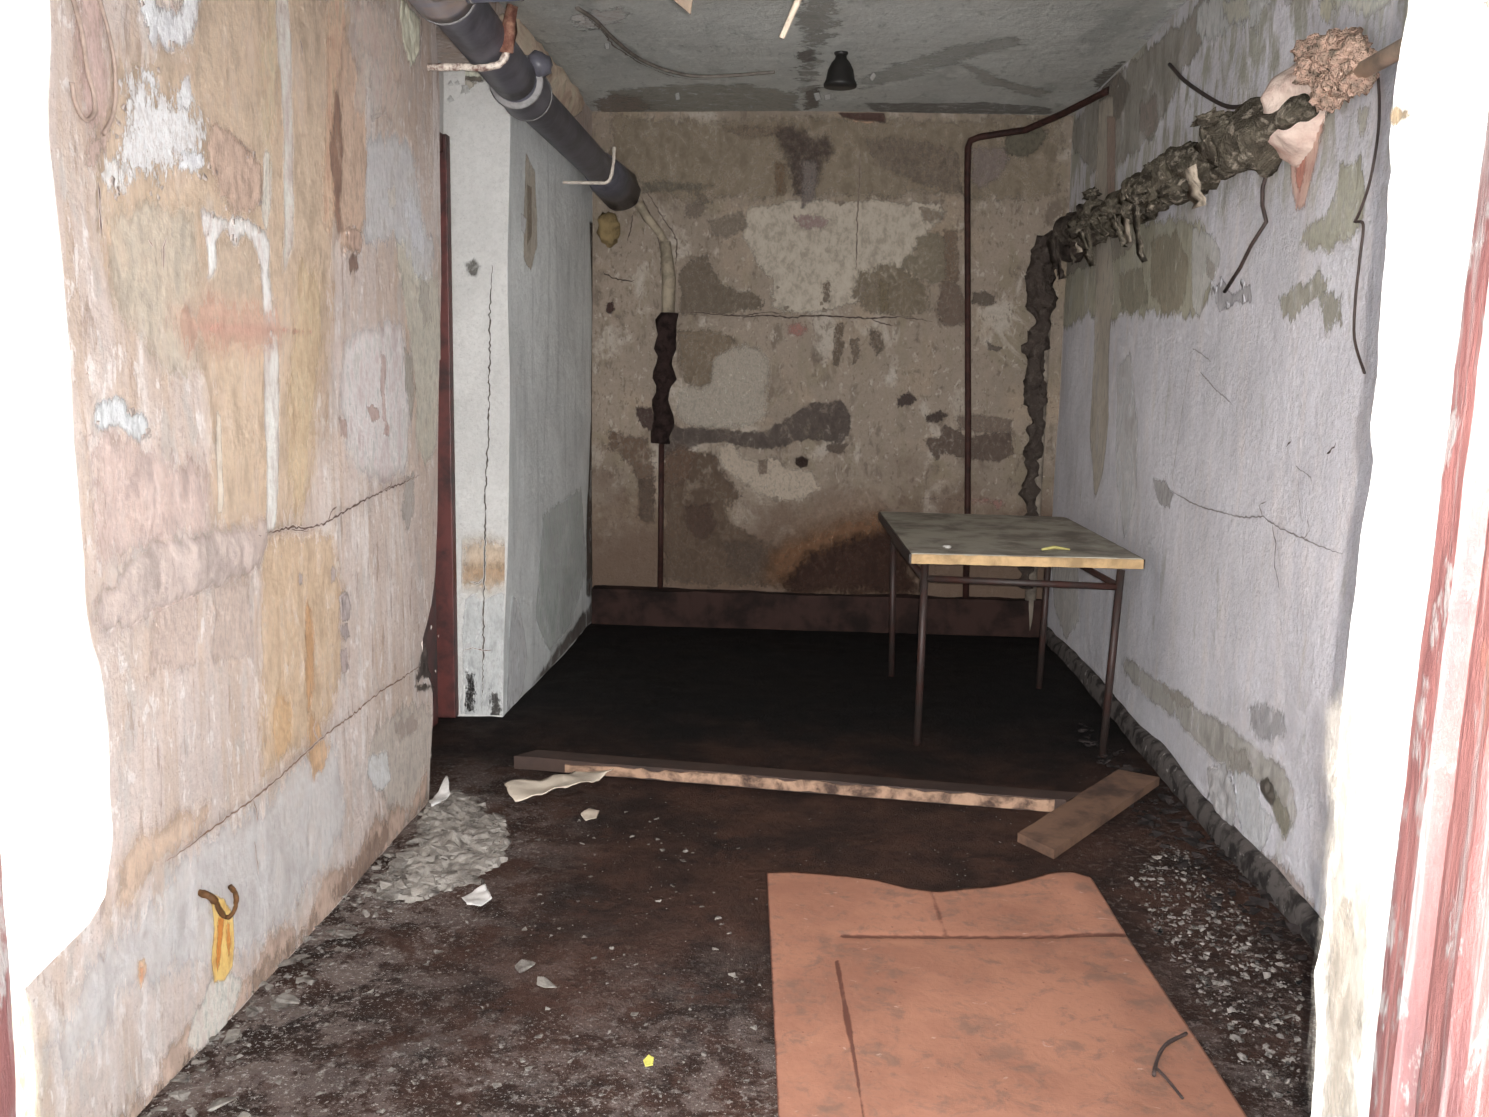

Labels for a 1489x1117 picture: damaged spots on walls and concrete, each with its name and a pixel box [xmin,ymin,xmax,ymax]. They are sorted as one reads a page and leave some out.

peeling [101,0,276,338]
water stain [593,0,1292,240]
peeling [95,396,152,442]
crack [258,475,419,537]
crack [464,265,494,714]
water stain [537,353,851,679]
water stain [832,229,996,366]
water stain [1063,215,1220,533]
crack [1172,348,1342,590]
crack [165,662,424,874]
water stain [1124,659,1295,831]
corrosion [212,895,234,983]